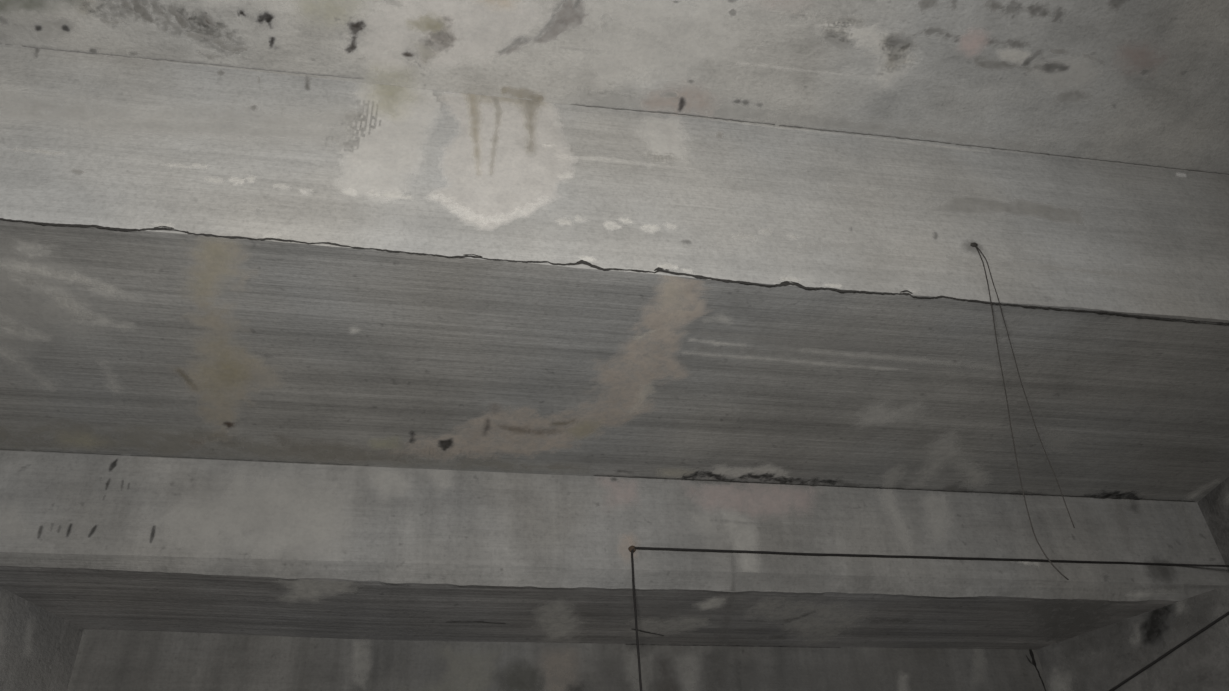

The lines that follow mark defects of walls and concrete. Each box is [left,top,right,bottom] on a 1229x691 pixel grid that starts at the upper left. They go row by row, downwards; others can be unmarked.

damp [342,75,576,229]
rust [469,88,543,174]
crack [0,218,1229,324]
spalling [664,464,859,487]